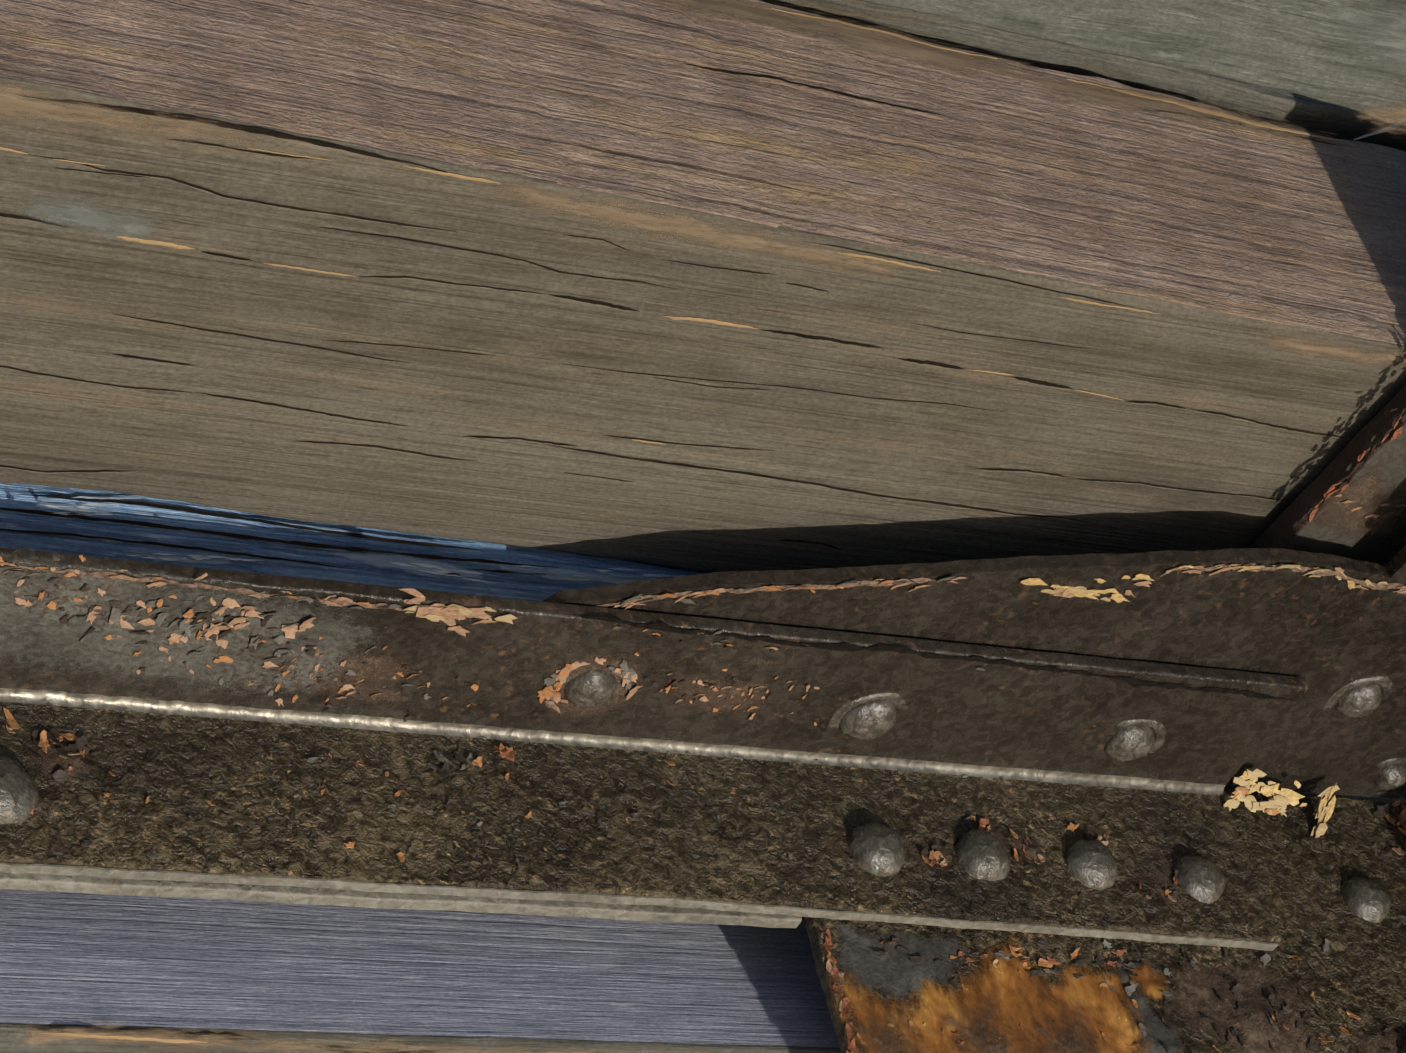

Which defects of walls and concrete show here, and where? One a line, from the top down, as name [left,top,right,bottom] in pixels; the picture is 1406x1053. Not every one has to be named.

crack [18,94,499,184]
corrosion [1367,104,1406,130]
crack [0,147,1348,439]
crack [0,465,668,580]
crack [0,354,1116,530]
corrosion [1301,407,1406,539]
peeling [0,547,518,722]
peeling [537,653,820,720]
peeling [594,576,968,610]
peeling [1020,563,1406,603]
peeling [1223,768,1339,838]
corrosion [823,928,1406,1053]